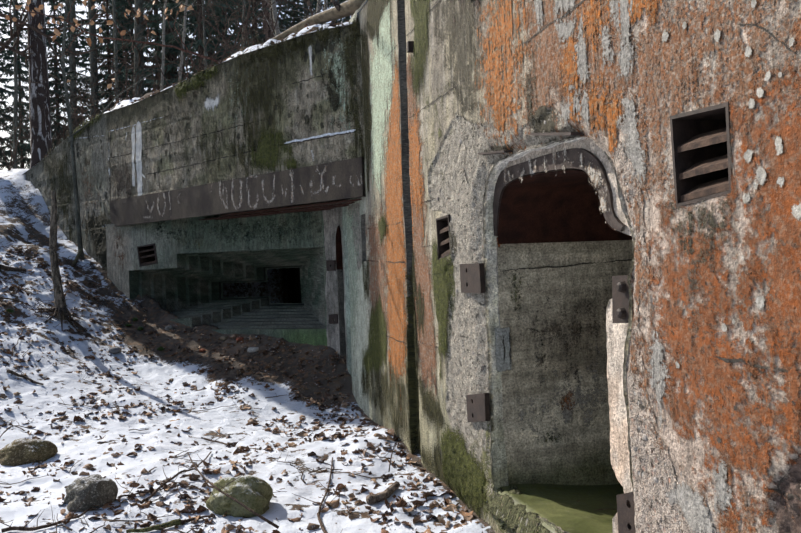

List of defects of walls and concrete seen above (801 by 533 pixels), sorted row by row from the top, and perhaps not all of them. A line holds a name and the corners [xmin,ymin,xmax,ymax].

crack [738,16,796,54]
damp [205,97,219,112]
damp [323,0,396,200]
damp [108,121,362,248]
rust [365,53,438,404]
crack [500,259,632,272]
rust [475,0,801,533]
crack [714,356,801,376]
damp [473,419,516,533]